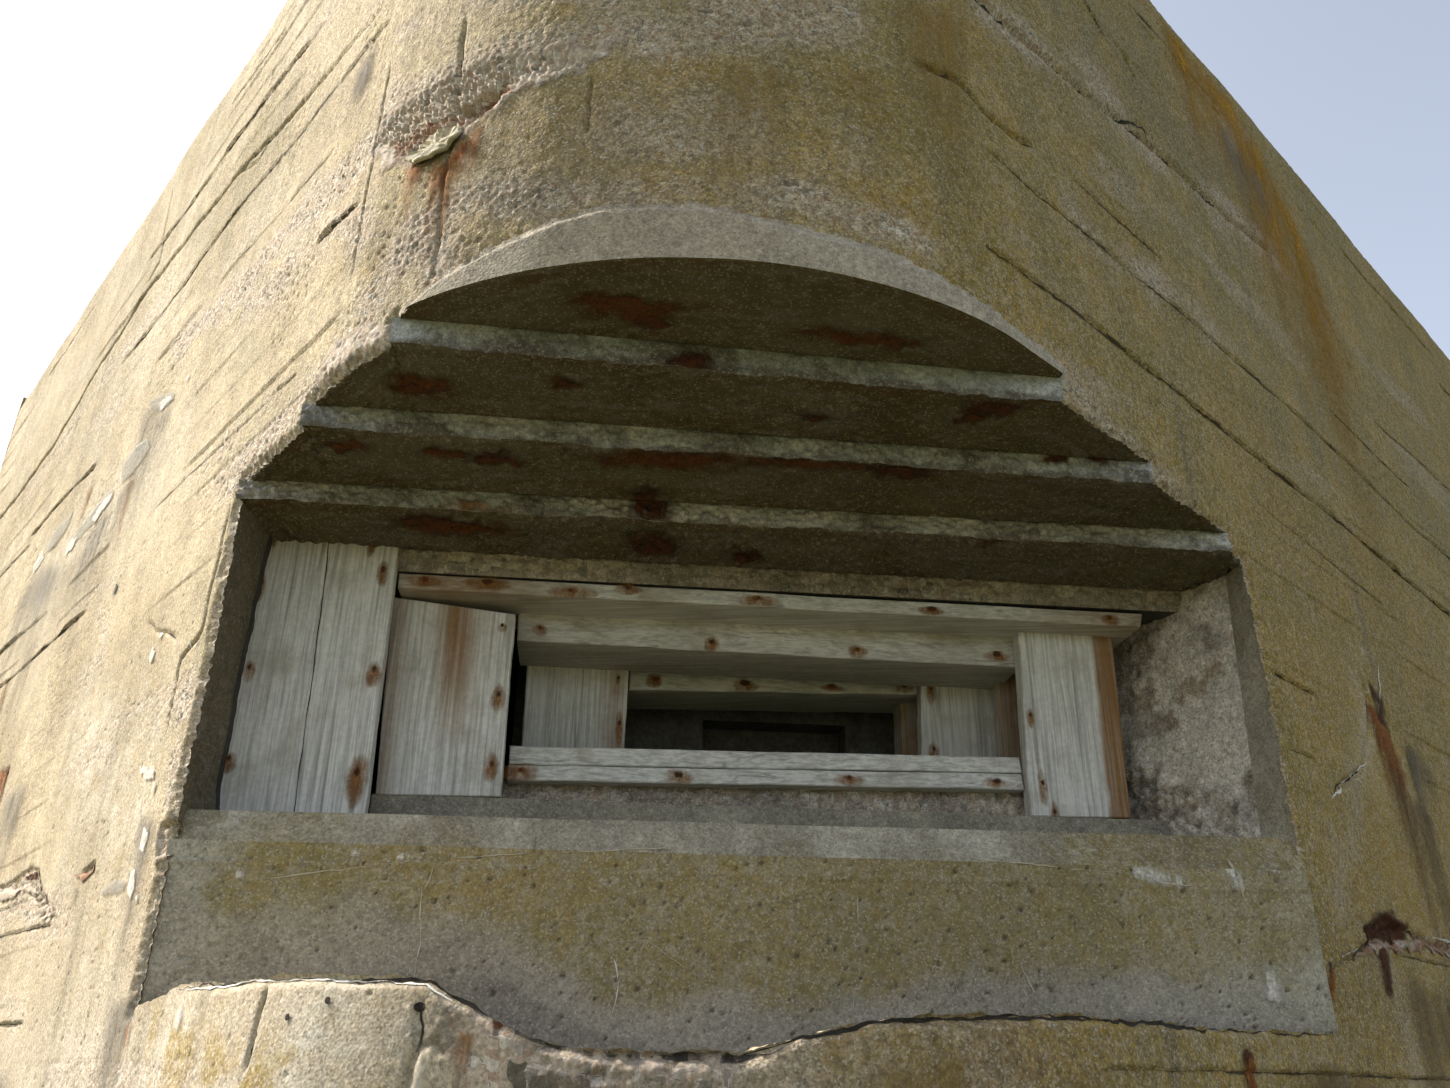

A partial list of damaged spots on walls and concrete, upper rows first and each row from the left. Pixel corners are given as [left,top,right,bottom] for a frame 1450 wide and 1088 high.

spalling [370,35,618,172]
corrosion [668,350,713,370]
corrosion [598,450,928,480]
corrosion [631,486,673,521]
corrosion [368,545,387,584]
corrosion [0,766,9,797]
corrosion [1366,683,1442,883]
spalling [0,869,57,919]
crack [179,847,1330,1086]
corrosion [1329,911,1450,996]
spalling [437,1005,734,1088]
corrosion [1244,1049,1258,1088]